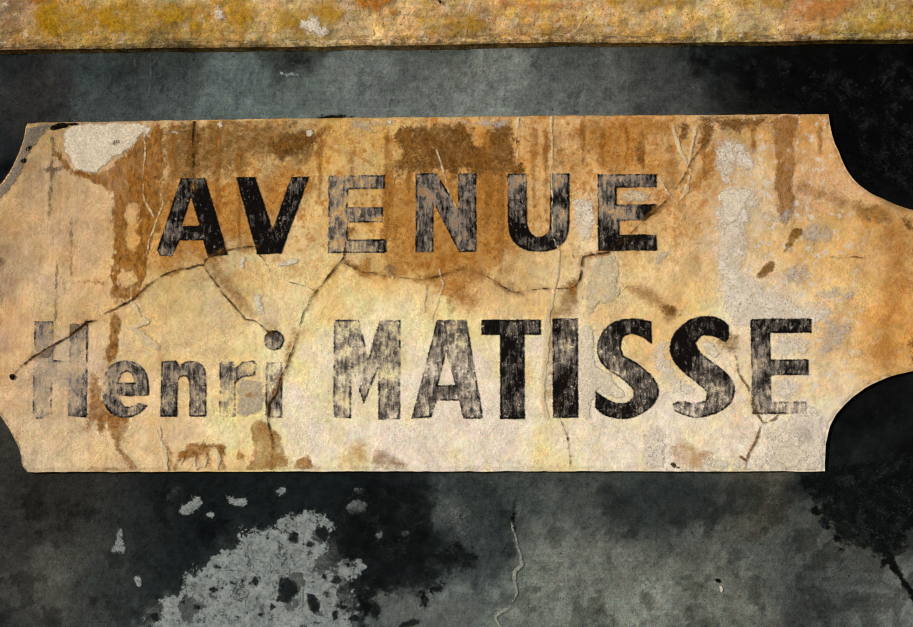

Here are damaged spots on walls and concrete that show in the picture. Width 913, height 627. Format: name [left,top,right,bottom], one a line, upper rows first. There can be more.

peeling [0,123,151,197]
corrosion [52,123,176,299]
corrosion [380,122,548,254]
corrosion [682,115,799,221]
crack [17,244,271,371]
crack [267,242,381,459]
corrosion [165,440,225,469]
peeling [179,497,214,518]
peeling [227,498,247,507]
peeling [143,509,367,627]
crack [735,356,779,465]
water stain [796,453,913,601]